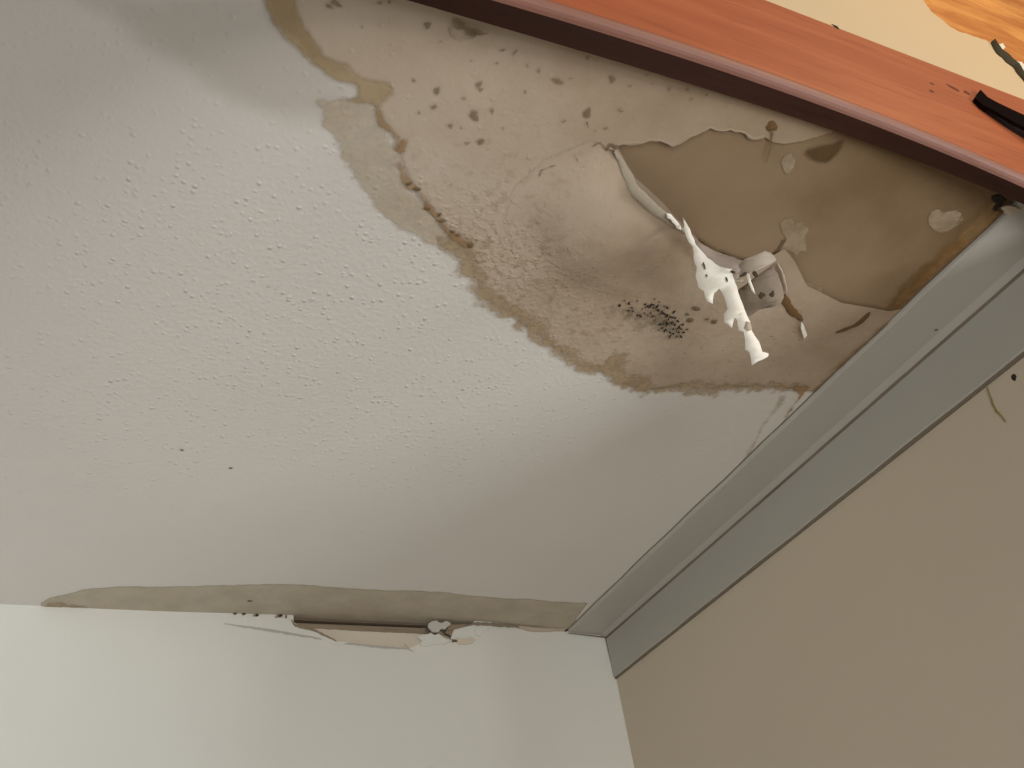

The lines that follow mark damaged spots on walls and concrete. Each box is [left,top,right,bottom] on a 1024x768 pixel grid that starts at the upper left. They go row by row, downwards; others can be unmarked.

water stain [265,0,901,417]
peeling [683,218,784,365]
spalling [275,614,490,652]